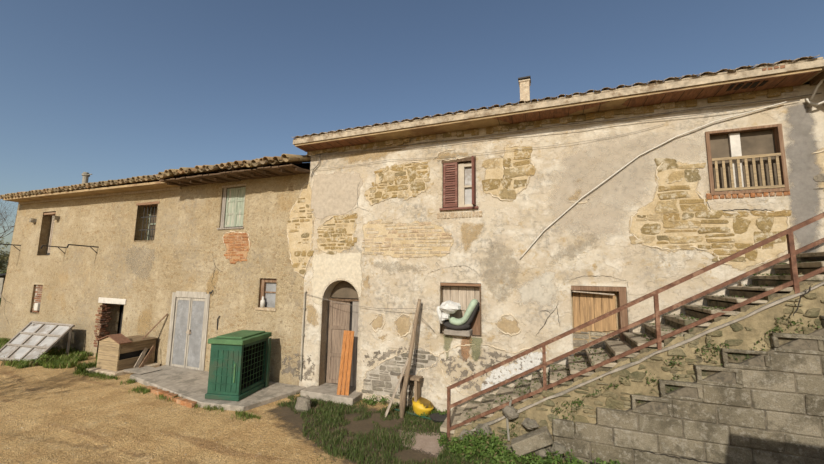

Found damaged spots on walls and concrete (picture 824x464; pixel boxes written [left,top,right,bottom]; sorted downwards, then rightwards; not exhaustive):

spalling [296,136,408,162]
flaking render [364,149,467,206]
flaking render [482,145,536,202]
flaking render [812,148,824,190]
flaking render [629,158,792,270]
flaking render [222,231,251,264]
flaking render [287,183,454,325]
spalling [362,313,549,399]